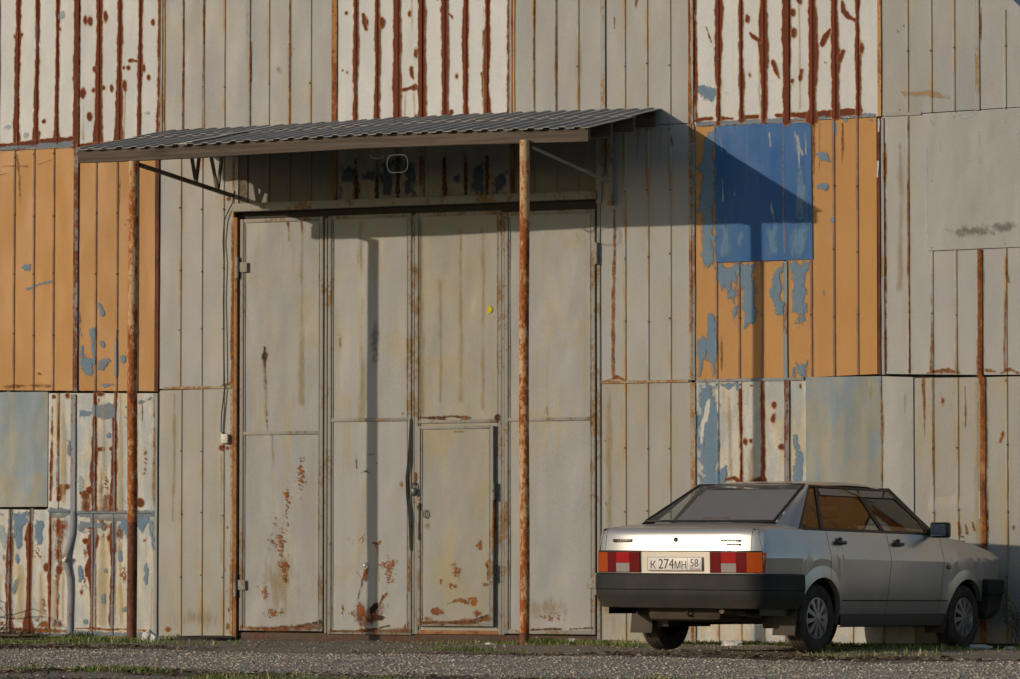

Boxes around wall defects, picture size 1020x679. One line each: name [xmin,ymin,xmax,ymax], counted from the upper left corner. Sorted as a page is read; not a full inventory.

rust [0,0,161,196]
rust [342,0,427,121]
rust [440,0,469,115]
rust [481,0,491,113]
rust [688,0,864,174]
peeling [797,146,831,167]
peeling [819,113,880,136]
peeling [696,118,810,328]
peeling [77,312,126,388]
peeling [694,313,739,498]
peeling [0,402,154,636]
rust [226,537,490,633]